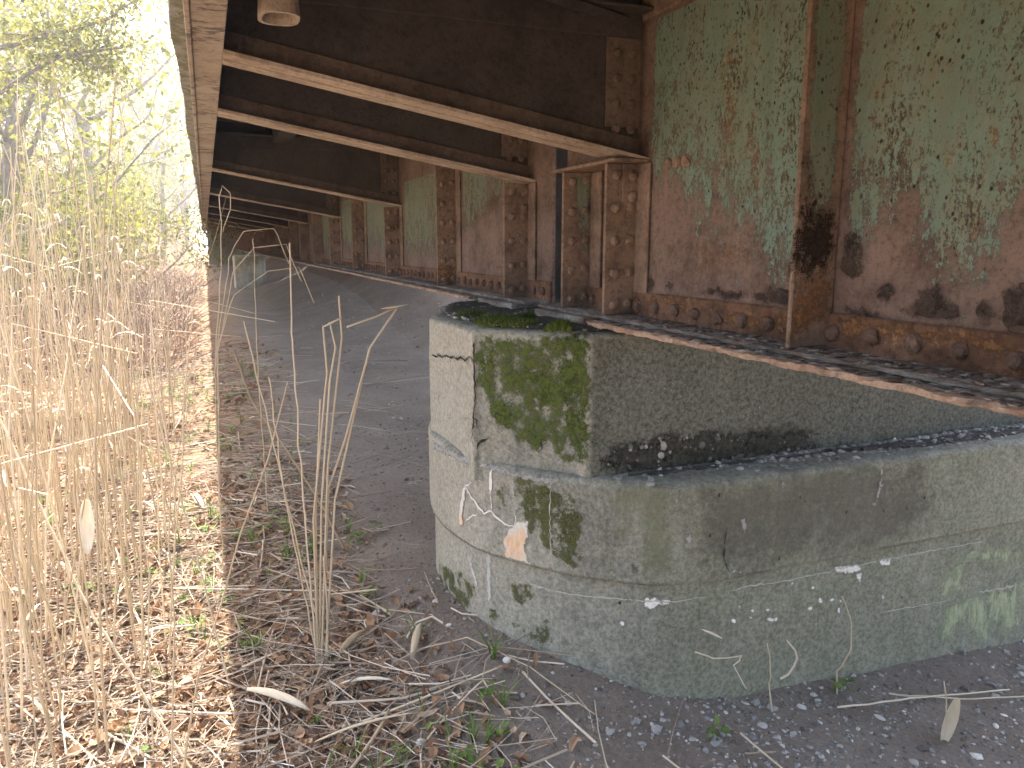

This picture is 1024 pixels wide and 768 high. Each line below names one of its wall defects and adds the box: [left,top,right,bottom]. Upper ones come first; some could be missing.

peeling [650,0,808,288]
peeling [844,0,1024,322]
corrosion [702,183,863,339]
corrosion [903,284,959,319]
corrosion [976,283,1024,332]
crack [432,340,488,449]
crack [464,470,516,527]
crack [546,483,554,557]